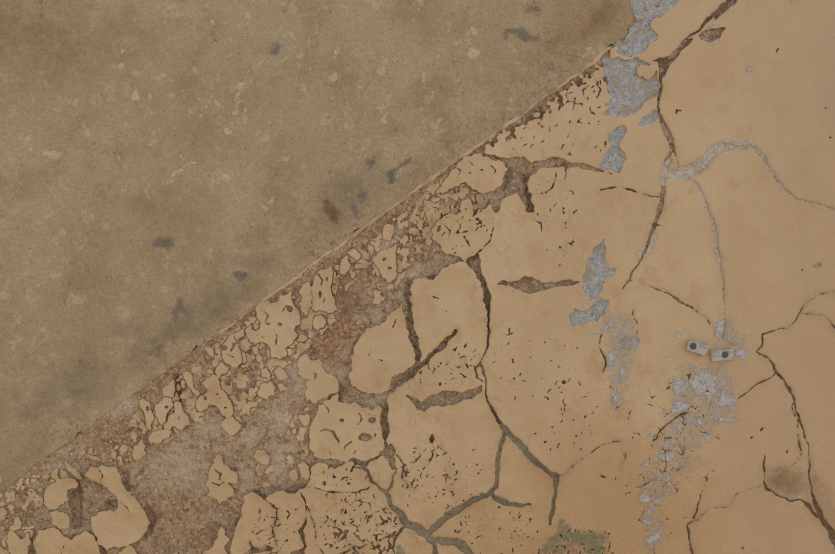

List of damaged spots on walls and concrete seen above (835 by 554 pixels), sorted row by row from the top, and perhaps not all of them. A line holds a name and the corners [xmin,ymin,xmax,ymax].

crack [491,63,610,150]
crack [545,163,567,193]
crack [600,0,835,339]
flaking render [0,0,679,490]
crack [465,218,494,264]
peeling [0,465,150,554]
peeling [206,455,238,503]
crack [234,327,573,554]
crack [591,373,720,493]
crack [665,293,835,554]